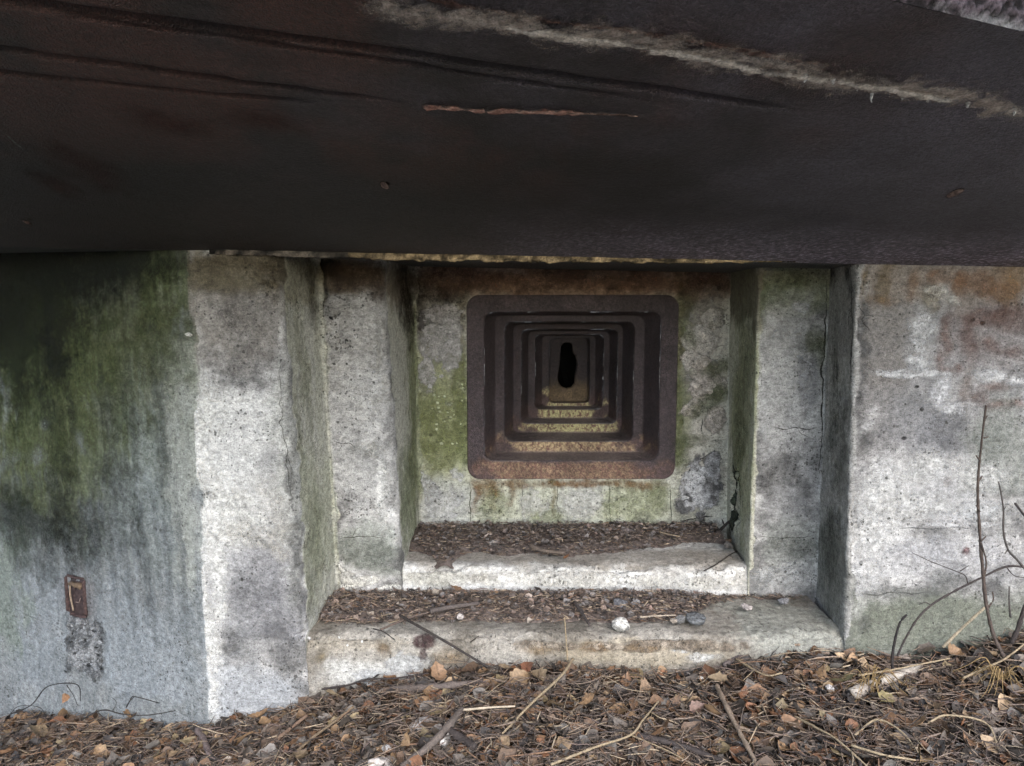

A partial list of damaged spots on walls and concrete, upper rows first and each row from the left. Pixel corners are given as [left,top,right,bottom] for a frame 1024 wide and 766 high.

leakage [377,0,1024,116]
crack [279,366,293,510]
crack [774,282,872,473]
spalling [64,615,104,682]